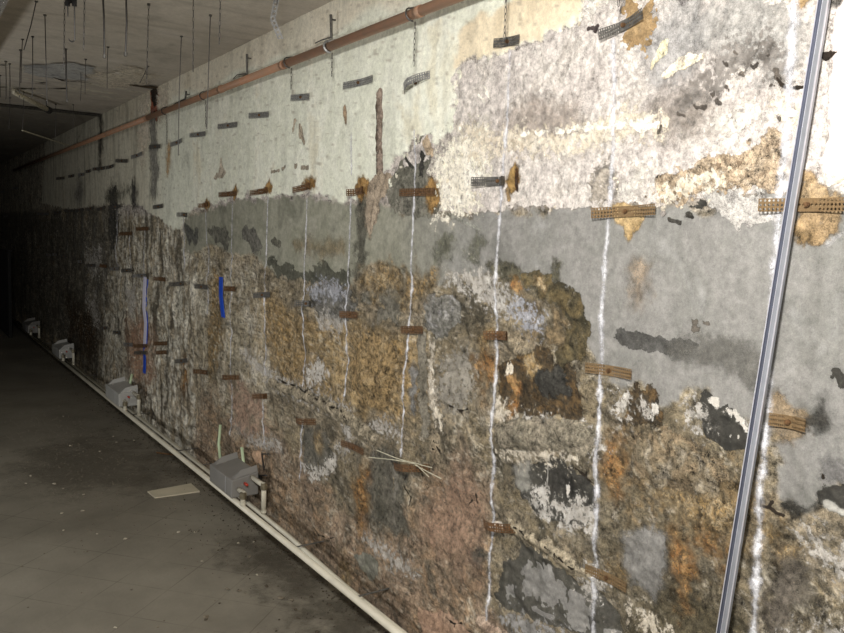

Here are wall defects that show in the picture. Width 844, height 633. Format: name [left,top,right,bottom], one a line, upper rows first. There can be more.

corrosion [620,0,659,59]
flaking render [364,0,817,235]
flaking render [803,34,844,199]
corrosion [355,175,369,200]
corrosion [505,162,520,202]
corrosion [793,170,842,246]
flaking render [408,330,444,438]
leakage [422,99,670,538]
leakage [614,319,760,387]
leakage [676,389,749,451]
flaking render [424,478,503,562]
leakage [762,455,844,633]